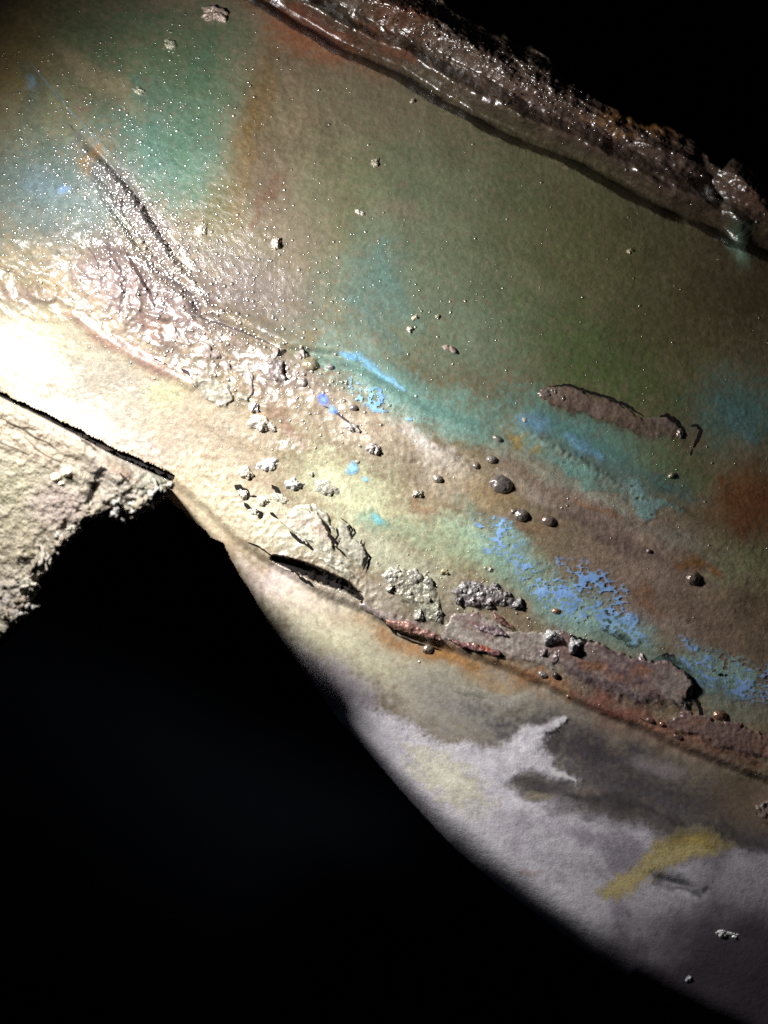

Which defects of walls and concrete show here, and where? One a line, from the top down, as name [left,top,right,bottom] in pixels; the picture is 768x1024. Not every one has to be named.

spalling [0,432,176,646]
peeling [311,504,367,576]
crack [248,510,440,650]
rust [665,710,768,759]
damp [333,697,768,1024]